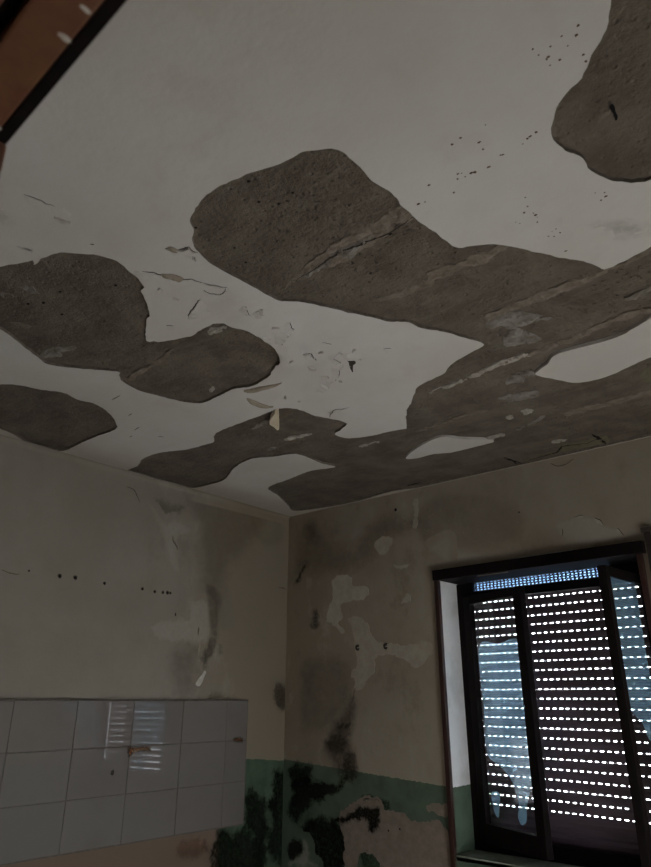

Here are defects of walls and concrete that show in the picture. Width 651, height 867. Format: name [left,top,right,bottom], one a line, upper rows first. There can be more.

flaking render [551,0,651,183]
flaking render [0,149,651,511]
peeling [326,575,433,691]
water stain [211,691,356,867]
peeling [335,794,451,867]